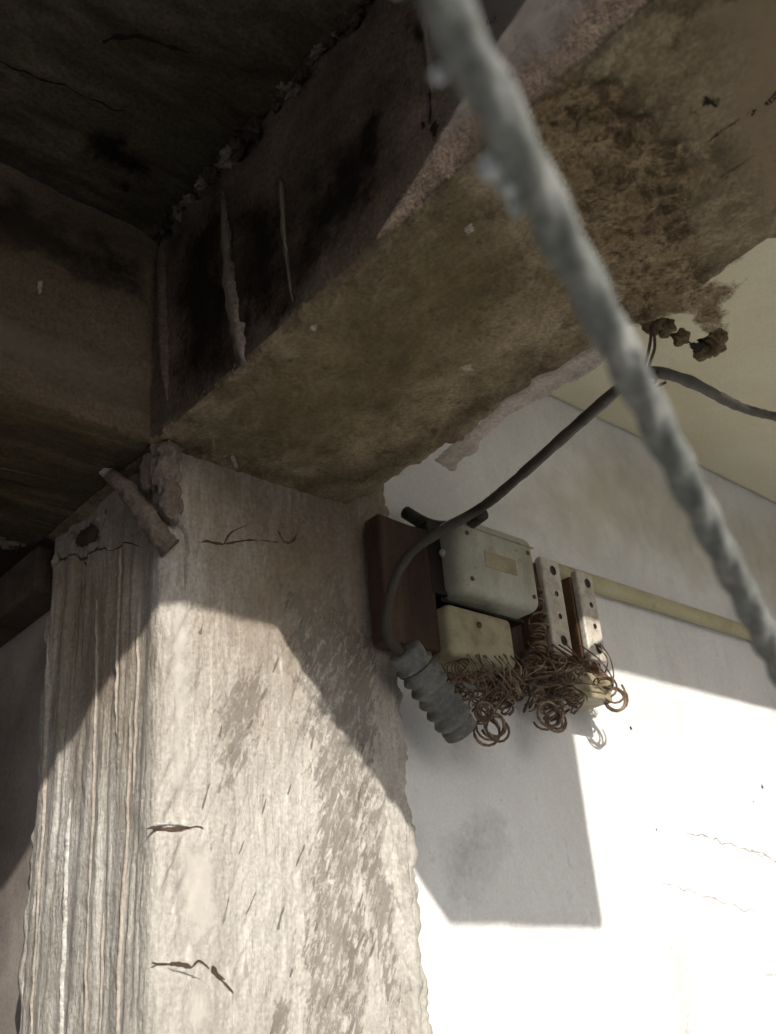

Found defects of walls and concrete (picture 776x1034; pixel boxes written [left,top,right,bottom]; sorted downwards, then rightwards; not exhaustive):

crack [0,61,130,114]
water stain [178,212,280,383]
spalling [66,509,107,548]
crack [60,526,139,592]
crack [198,525,297,545]
crack [147,821,204,831]
crack [692,834,776,862]
crack [151,960,233,1034]